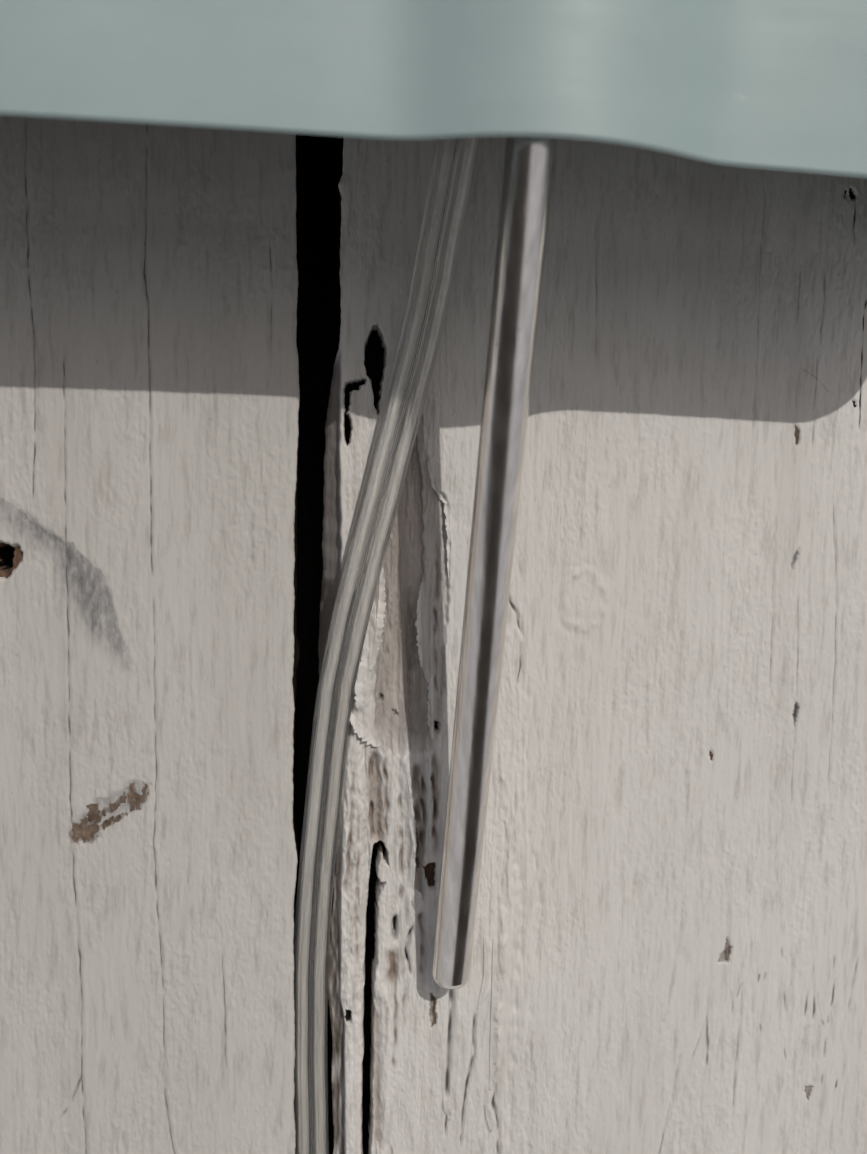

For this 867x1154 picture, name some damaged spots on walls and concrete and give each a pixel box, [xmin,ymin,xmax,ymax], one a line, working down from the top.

crack [859,301,867,424]
peeling [350,435,450,915]